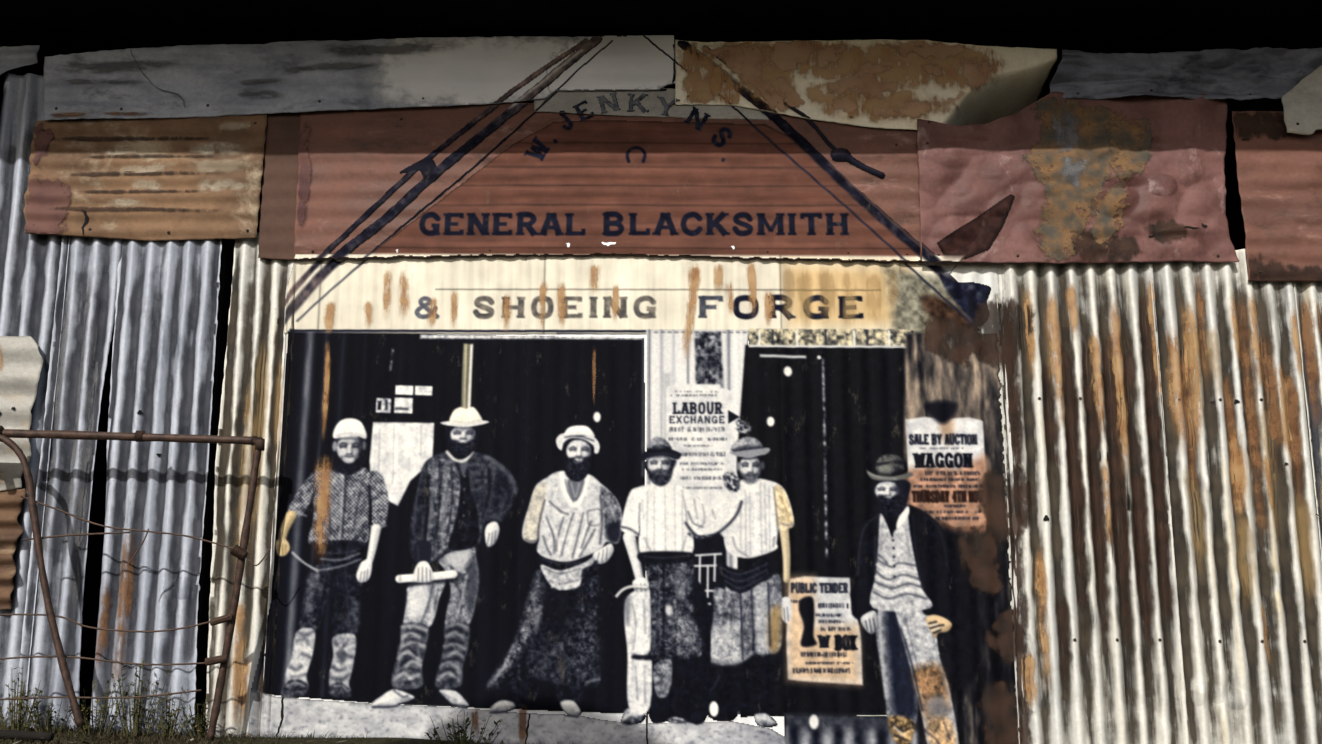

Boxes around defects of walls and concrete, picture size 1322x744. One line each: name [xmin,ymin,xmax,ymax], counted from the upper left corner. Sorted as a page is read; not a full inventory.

crack [130,49,185,107]
corrosion [681,41,1002,121]
corrosion [23,114,267,241]
corrosion [1052,112,1086,187]
corrosion [325,303,335,329]
corrosion [366,273,408,322]
corrosion [540,284,566,322]
corrosion [684,265,733,348]
corrosion [748,264,773,321]
corrosion [1223,299,1322,525]
corrosion [0,488,26,610]
corrosion [924,281,1208,744]